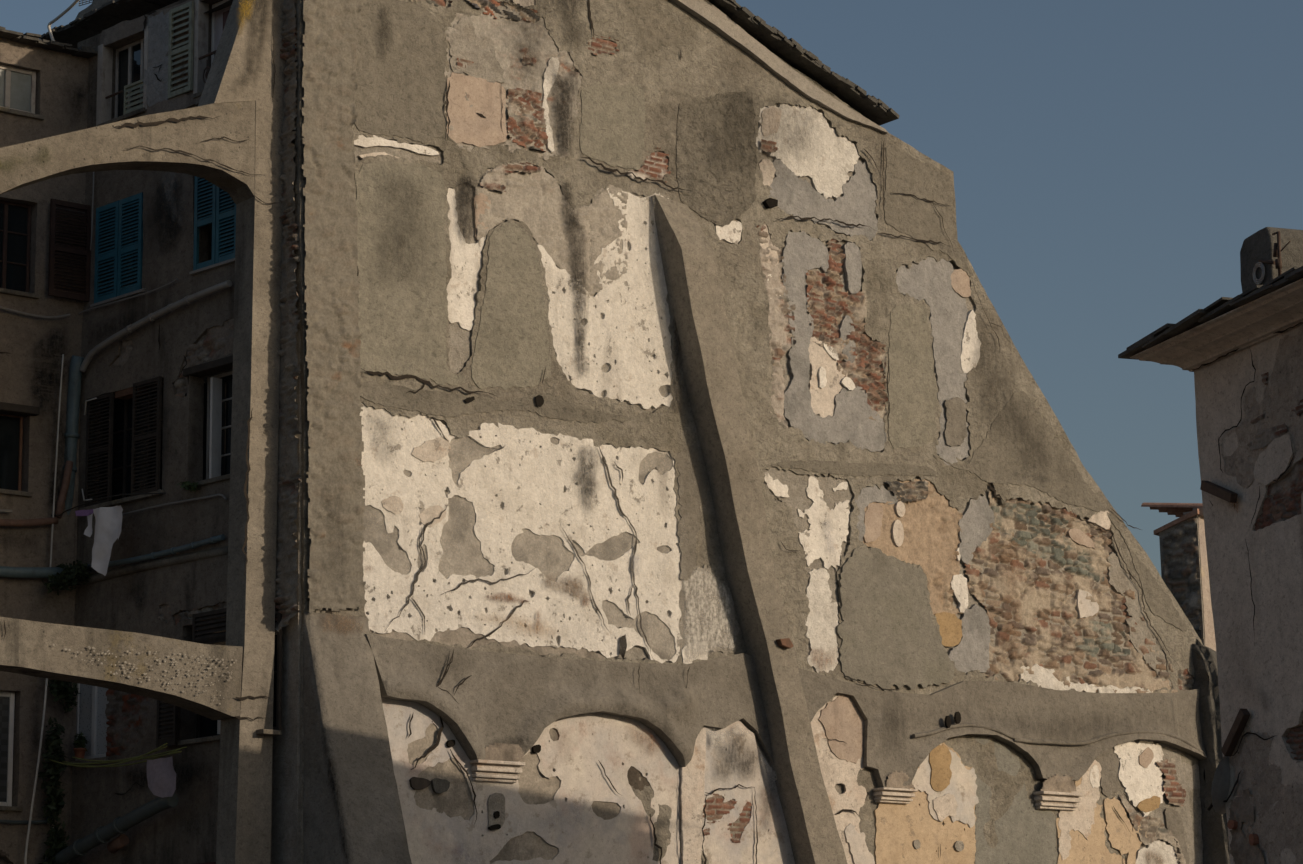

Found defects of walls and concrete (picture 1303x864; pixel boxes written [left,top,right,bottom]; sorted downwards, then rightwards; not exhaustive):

peeling [354,134,442,165]
peeling [411,0,673,410]
peeling [756,104,860,199]
spalling [714,219,888,429]
crack [242,408,253,576]
peeling [360,403,740,664]
crack [562,447,652,690]
spalling [764,467,1194,693]
peeling [627,766,650,791]
spalling [702,794,752,843]
peeling [811,694,979,864]
peeling [1056,740,1203,864]